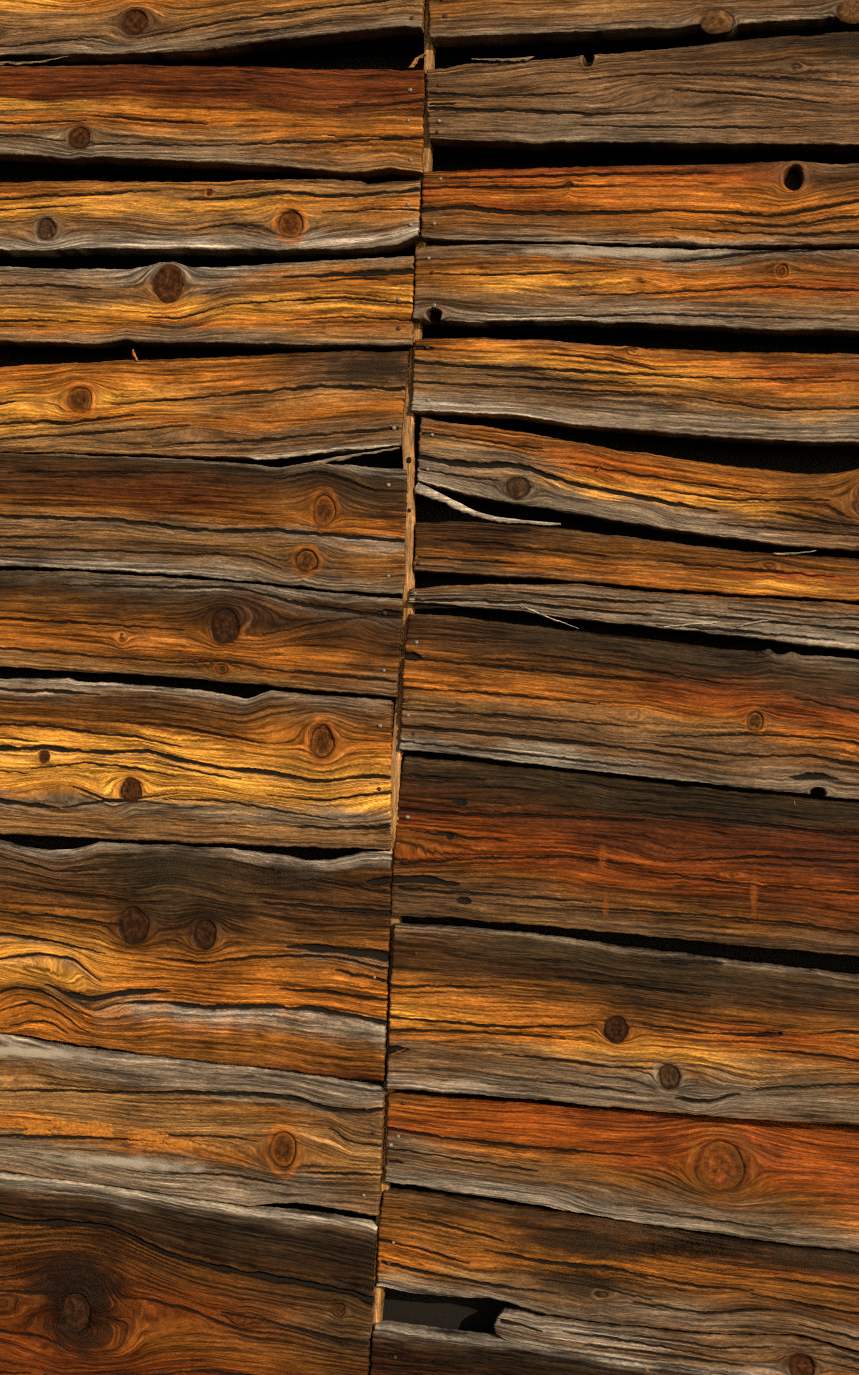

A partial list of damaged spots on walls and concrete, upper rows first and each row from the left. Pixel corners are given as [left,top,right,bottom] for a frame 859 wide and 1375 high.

crack [0,172,859,536]
crack [0,1330,76,1354]
crack [0,1213,374,1303]
crack [144,1298,452,1365]
crack [379,1217,859,1367]